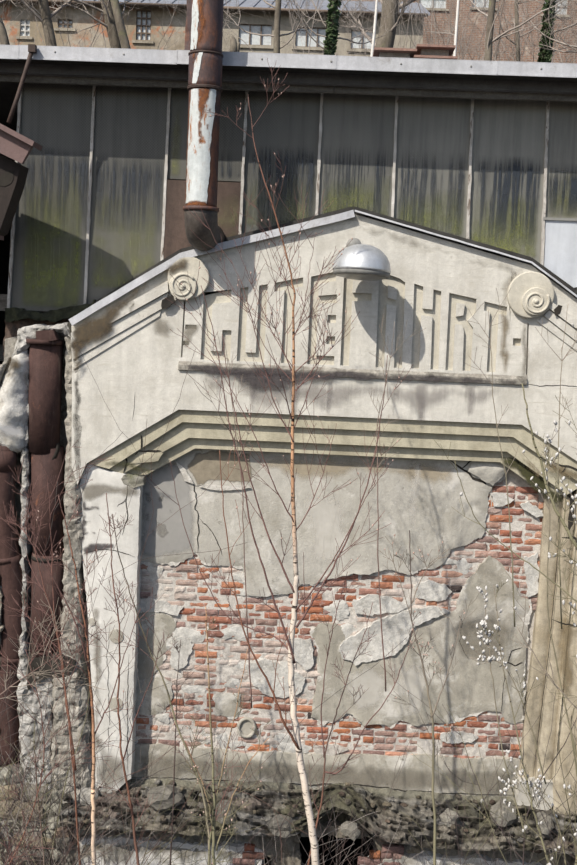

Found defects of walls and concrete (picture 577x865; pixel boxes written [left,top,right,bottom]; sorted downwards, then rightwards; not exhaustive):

corrosion [186,88,210,177]
leakage [24,155,162,213]
leakage [399,161,465,218]
leakage [477,161,540,224]
spalling [161,295,175,309]
leakage [189,365,489,388]
spalling [174,451,251,491]
crack [450,460,495,488]
spalling [136,480,543,758]
crack [532,493,577,781]
crack [106,627,229,781]
spalling [299,834,404,865]